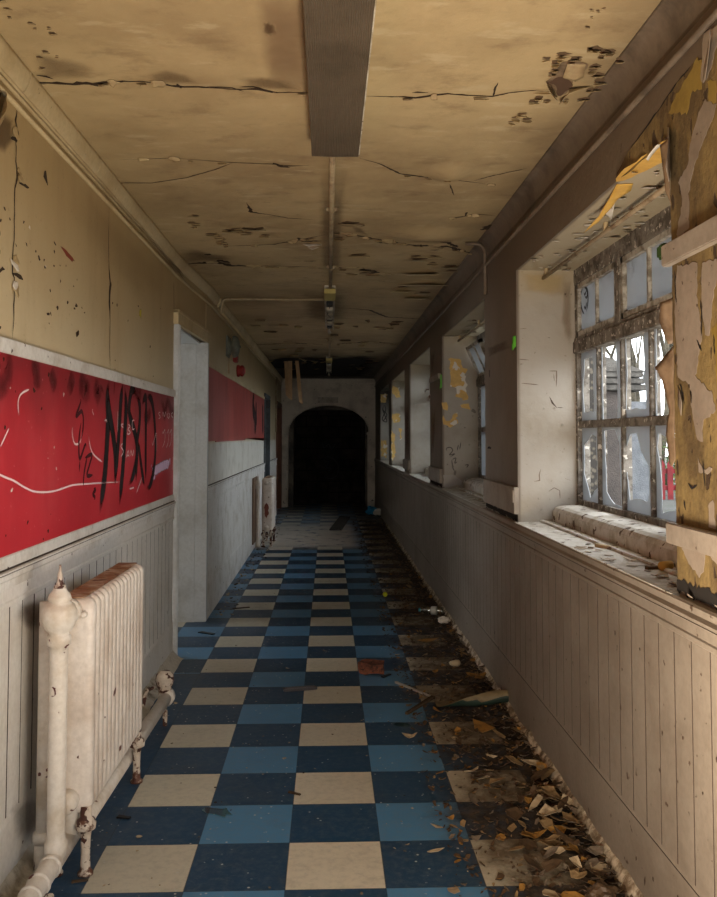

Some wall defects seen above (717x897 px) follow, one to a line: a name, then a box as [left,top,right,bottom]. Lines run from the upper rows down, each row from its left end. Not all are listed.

crack [37,75,308,95]
crack [373,83,551,101]
spalling [508,45,624,126]
crack [0,113,29,338]
peeling [10,243,61,298]
crack [126,157,308,183]
crack [188,204,472,276]
crack [360,158,522,230]
peeling [554,26,717,255]
peeling [442,358,476,428]
peeling [655,244,717,533]
peeling [667,546,717,607]